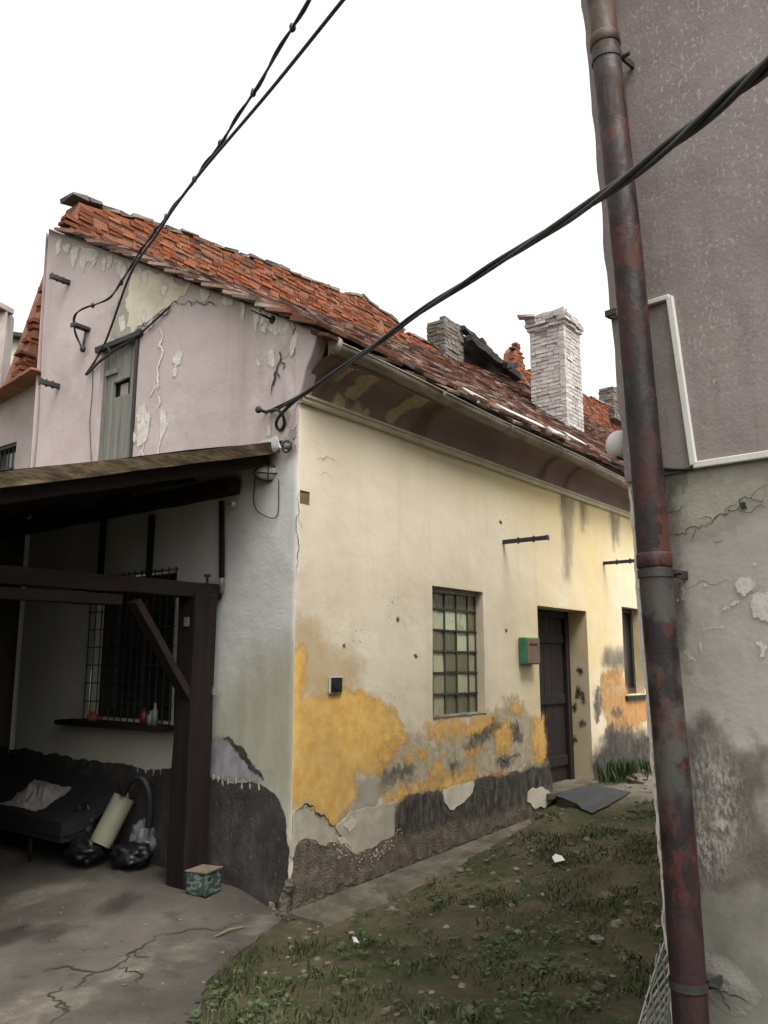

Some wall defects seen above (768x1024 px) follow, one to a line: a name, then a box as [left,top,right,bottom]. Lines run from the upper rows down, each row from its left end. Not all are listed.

peeling [56,238,298,372]
crack [136,300,218,409]
crack [271,323,297,394]
crack [667,485,768,543]
peeling [722,562,768,622]
leakage [605,652,624,668]
peeling [289,645,547,869]
peeling [572,487,669,975]
leakage [592,727,650,772]
crack [43,918,248,1022]